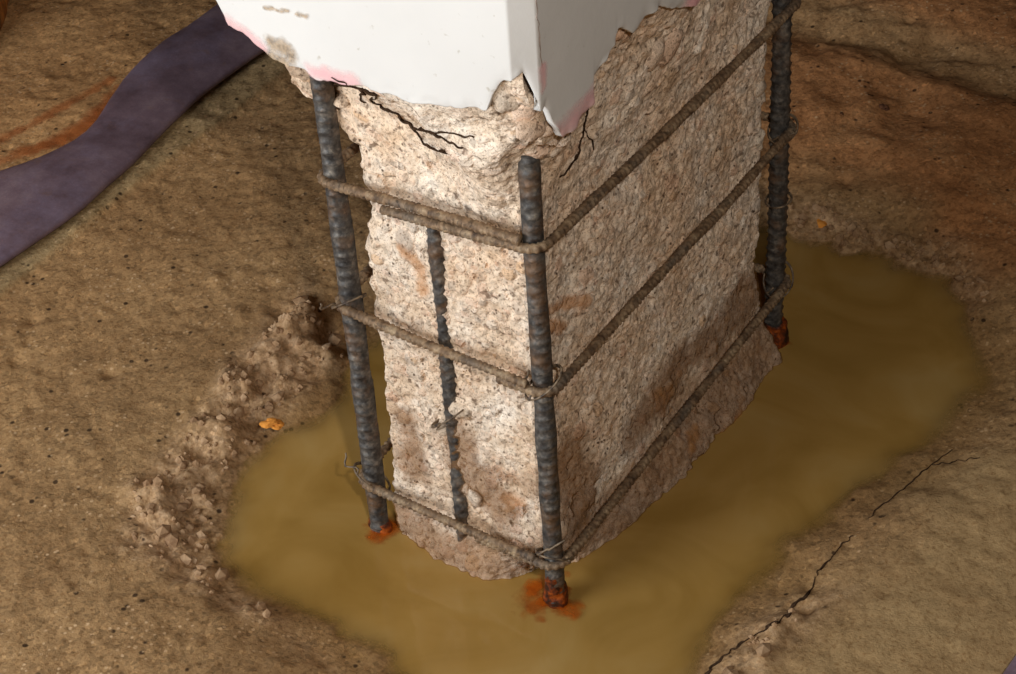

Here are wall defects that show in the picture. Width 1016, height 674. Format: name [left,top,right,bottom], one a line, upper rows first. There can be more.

spalling [267,38,313,99]
spalling [333,0,782,580]
corrosion [763,316,789,349]
corrosion [367,519,397,542]
crack [704,449,980,674]
corrosion [525,577,581,618]